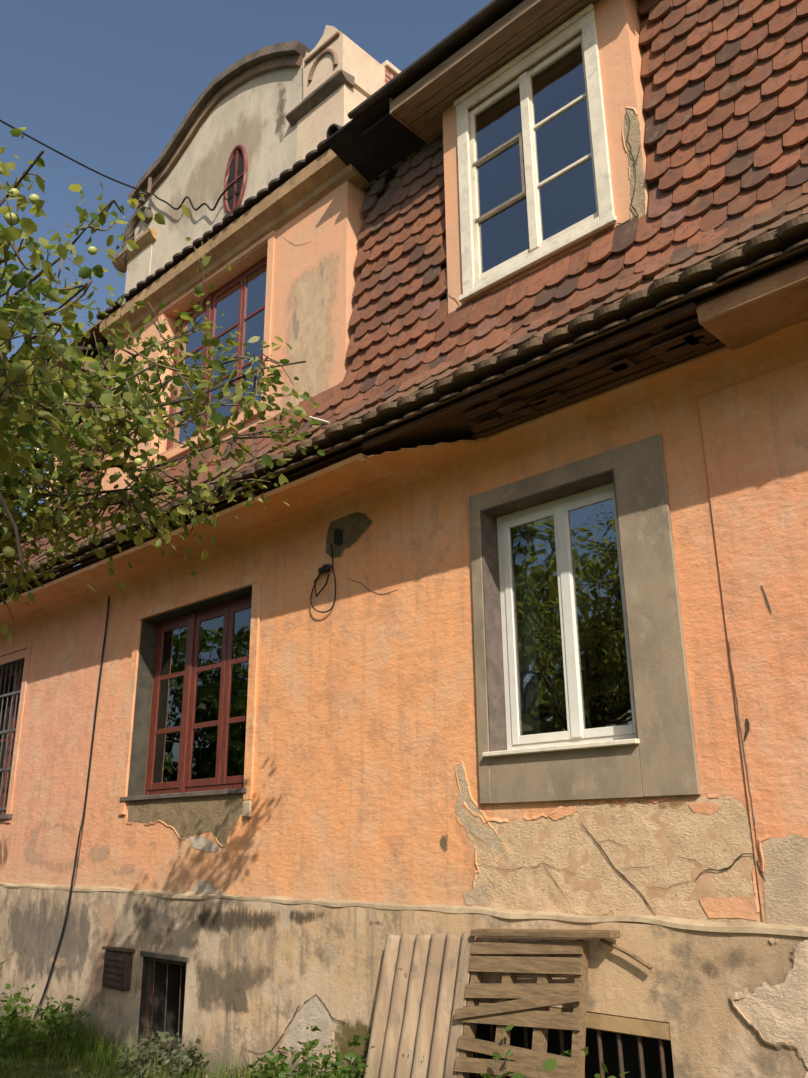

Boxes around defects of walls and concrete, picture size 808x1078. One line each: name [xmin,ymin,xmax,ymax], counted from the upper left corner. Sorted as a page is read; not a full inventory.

damp [282,256,338,409]
crack [581,642,766,916]
spalling [126,794,243,852]
spalling [454,760,808,927]
damp [1,898,89,980]
damp [197,909,273,934]
damp [290,911,322,924]
damp [198,964,270,1011]
spalling [728,938,808,1078]